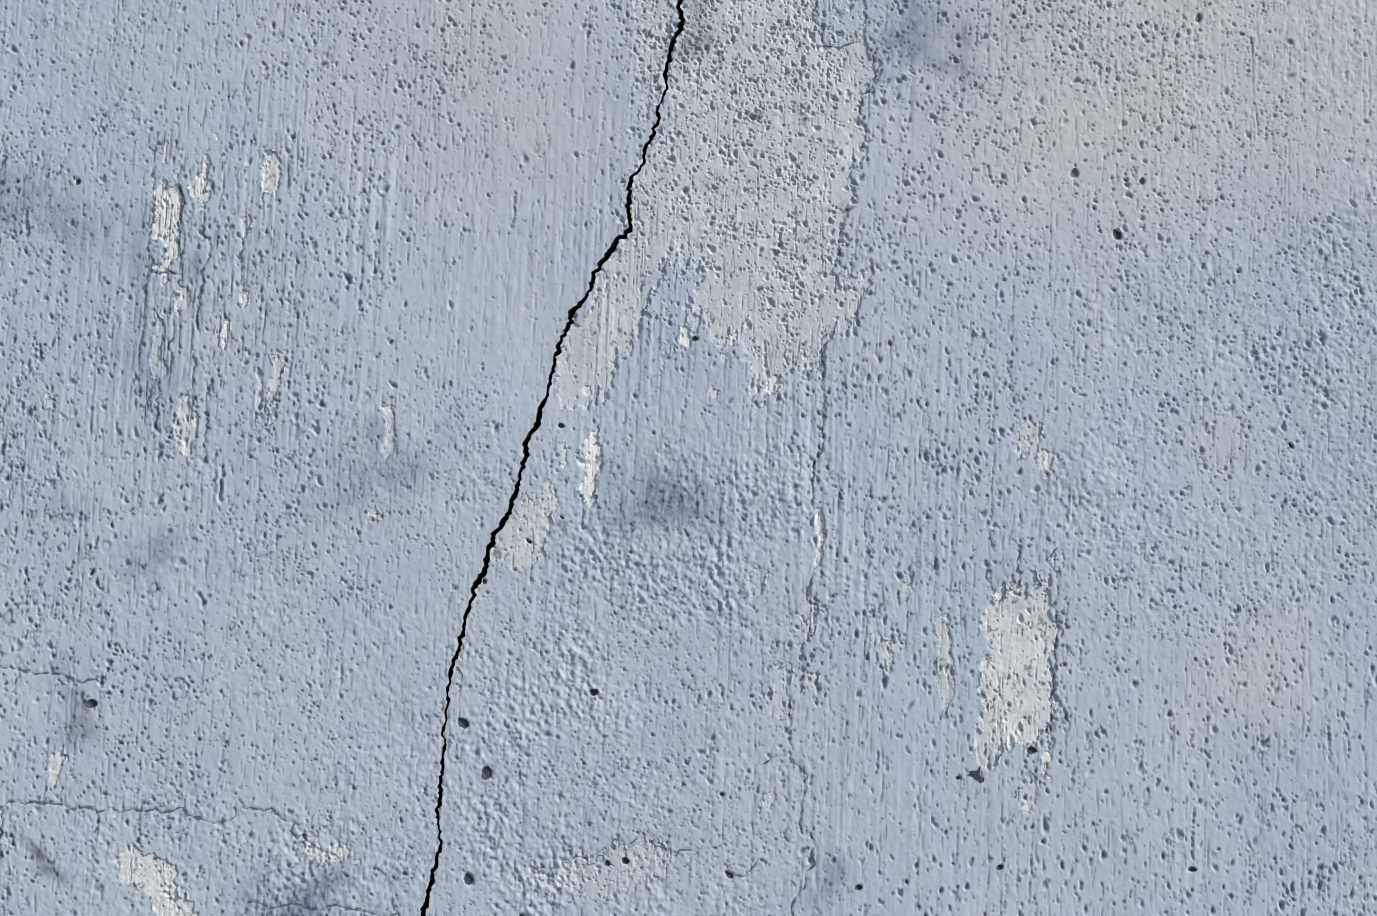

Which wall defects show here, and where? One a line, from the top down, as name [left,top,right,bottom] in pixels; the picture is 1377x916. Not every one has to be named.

spalling [259,148,282,194]
peeling [554,0,882,411]
peeling [149,139,212,381]
crack [240,0,693,916]
spalling [559,425,603,507]
peeling [492,479,559,571]
spalling [812,508,825,564]
crack [2,667,99,693]
peeling [975,550,1066,813]
crack [763,567,818,916]
crack [0,800,308,859]
peeling [114,844,198,916]